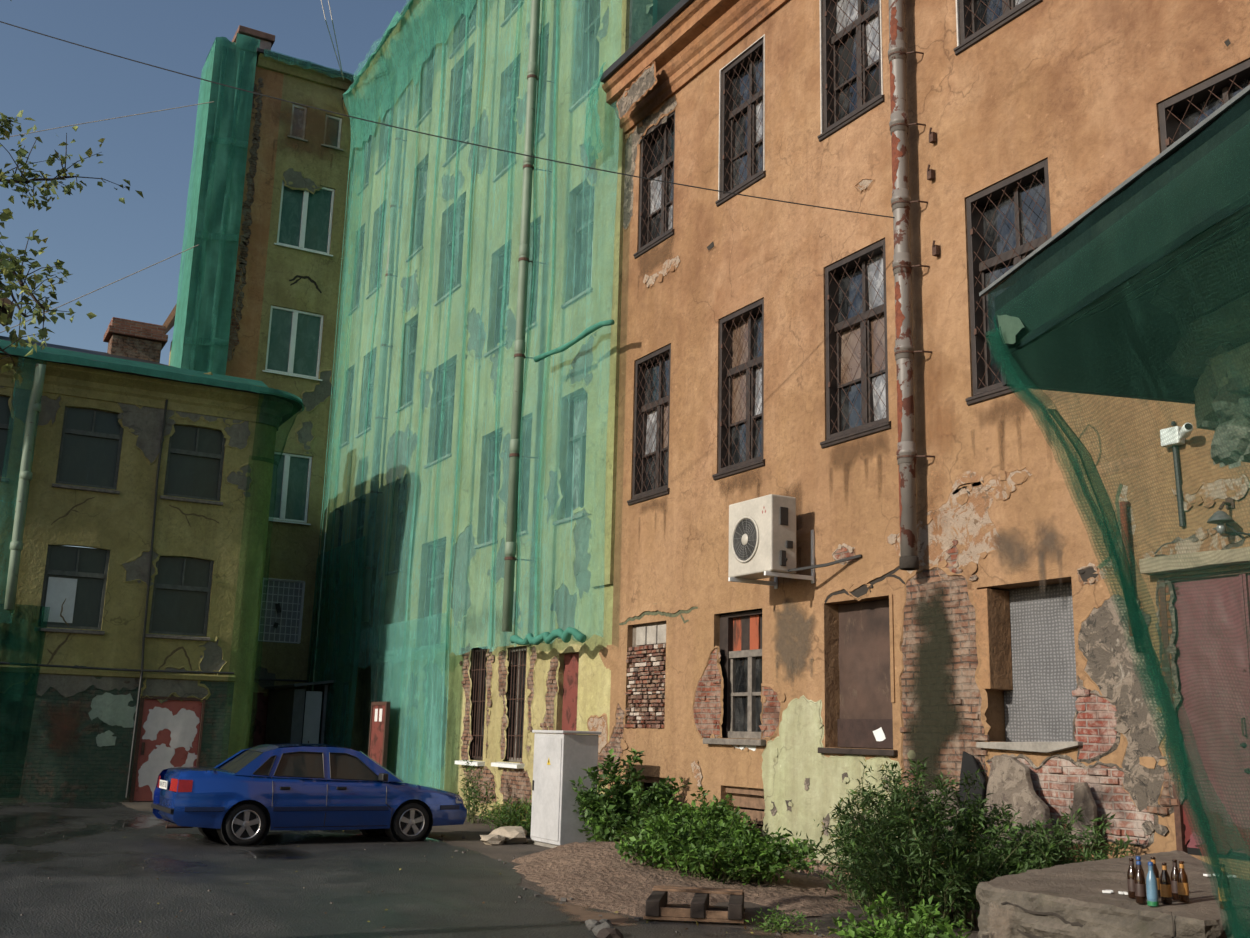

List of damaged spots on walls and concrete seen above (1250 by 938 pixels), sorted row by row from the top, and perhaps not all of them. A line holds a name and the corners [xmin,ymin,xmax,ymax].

rust [890,6,898,41]
spalling [616,62,678,232]
rust [891,132,903,189]
rust [895,281,905,338]
peeling [115,402,254,466]
peeling [36,636,229,747]
water stain [907,588,964,796]
flaking render [691,466,1250,857]